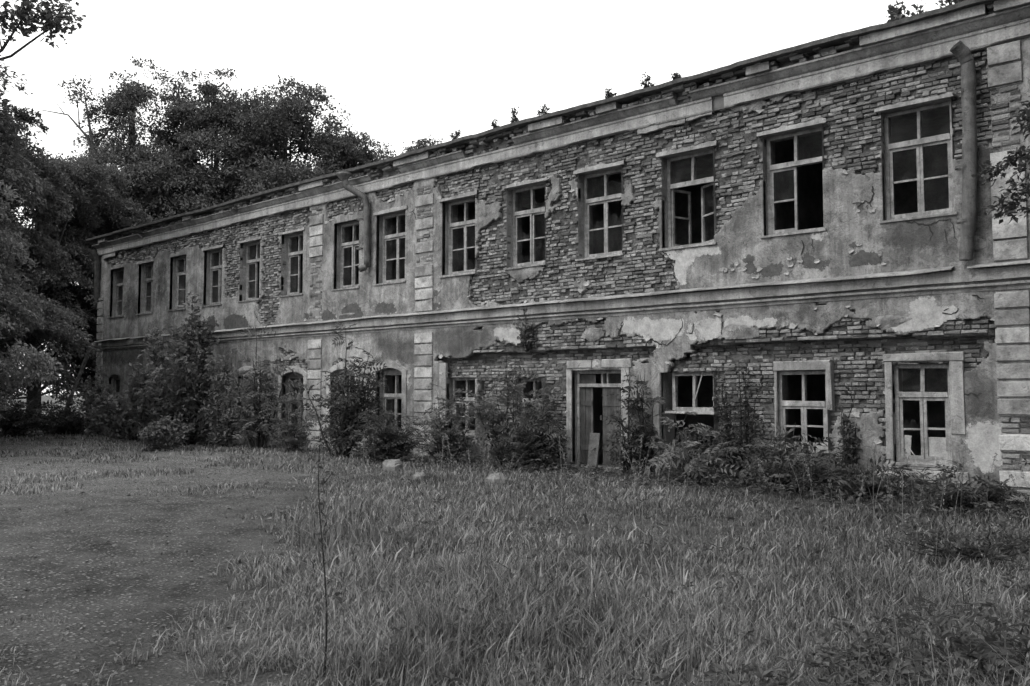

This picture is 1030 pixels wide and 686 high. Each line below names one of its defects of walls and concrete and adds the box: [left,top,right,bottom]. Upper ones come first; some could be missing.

flaking render [971,45,1022,153]
flaking render [376,56,962,306]
flaking render [107,196,363,331]
flaking render [304,259,397,322]
flaking render [439,296,997,466]